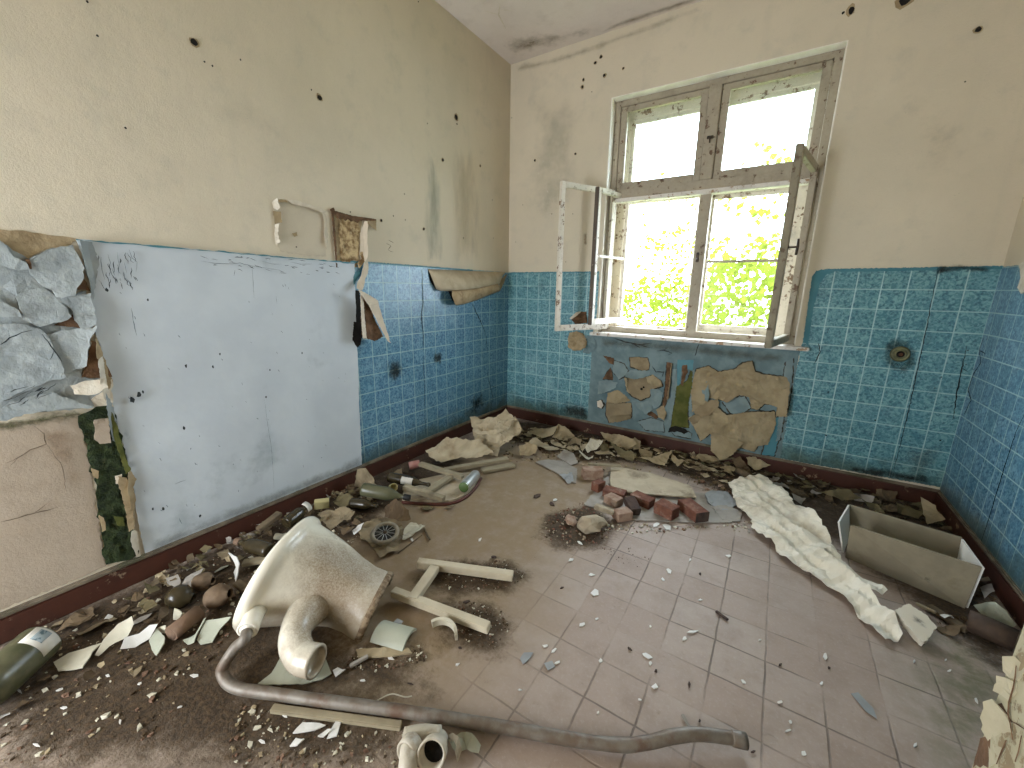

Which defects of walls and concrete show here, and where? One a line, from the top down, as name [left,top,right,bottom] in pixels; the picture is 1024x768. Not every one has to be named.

peeling [272,198,328,257]
crack [0,330,66,522]
flaking render [0,229,114,610]
crack [419,275,427,396]
peeling [597,356,794,460]
crack [892,272,938,477]
crack [953,341,985,417]